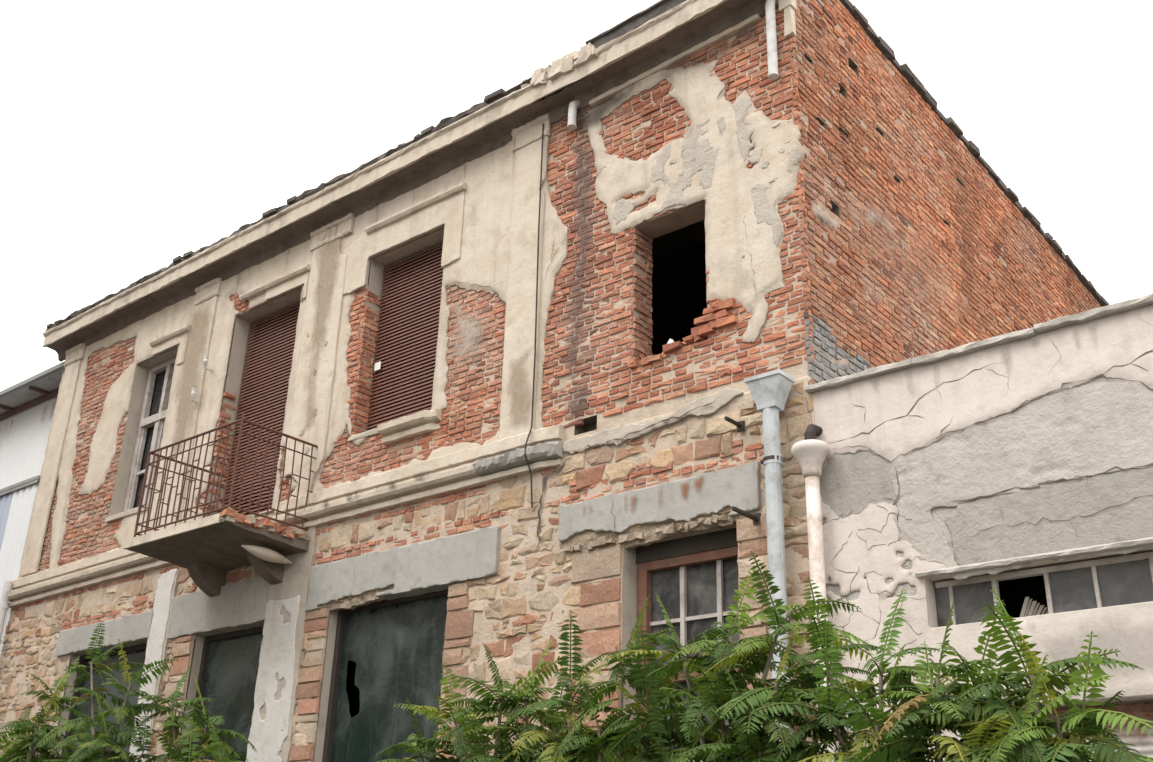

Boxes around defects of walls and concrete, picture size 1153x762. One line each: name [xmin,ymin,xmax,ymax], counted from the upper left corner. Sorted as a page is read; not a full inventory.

spalling [515,42,599,107]
spalling [541,8,840,436]
spalling [38,337,137,572]
spalling [320,286,506,488]
spalling [820,376,1153,580]
crack [822,324,1153,677]